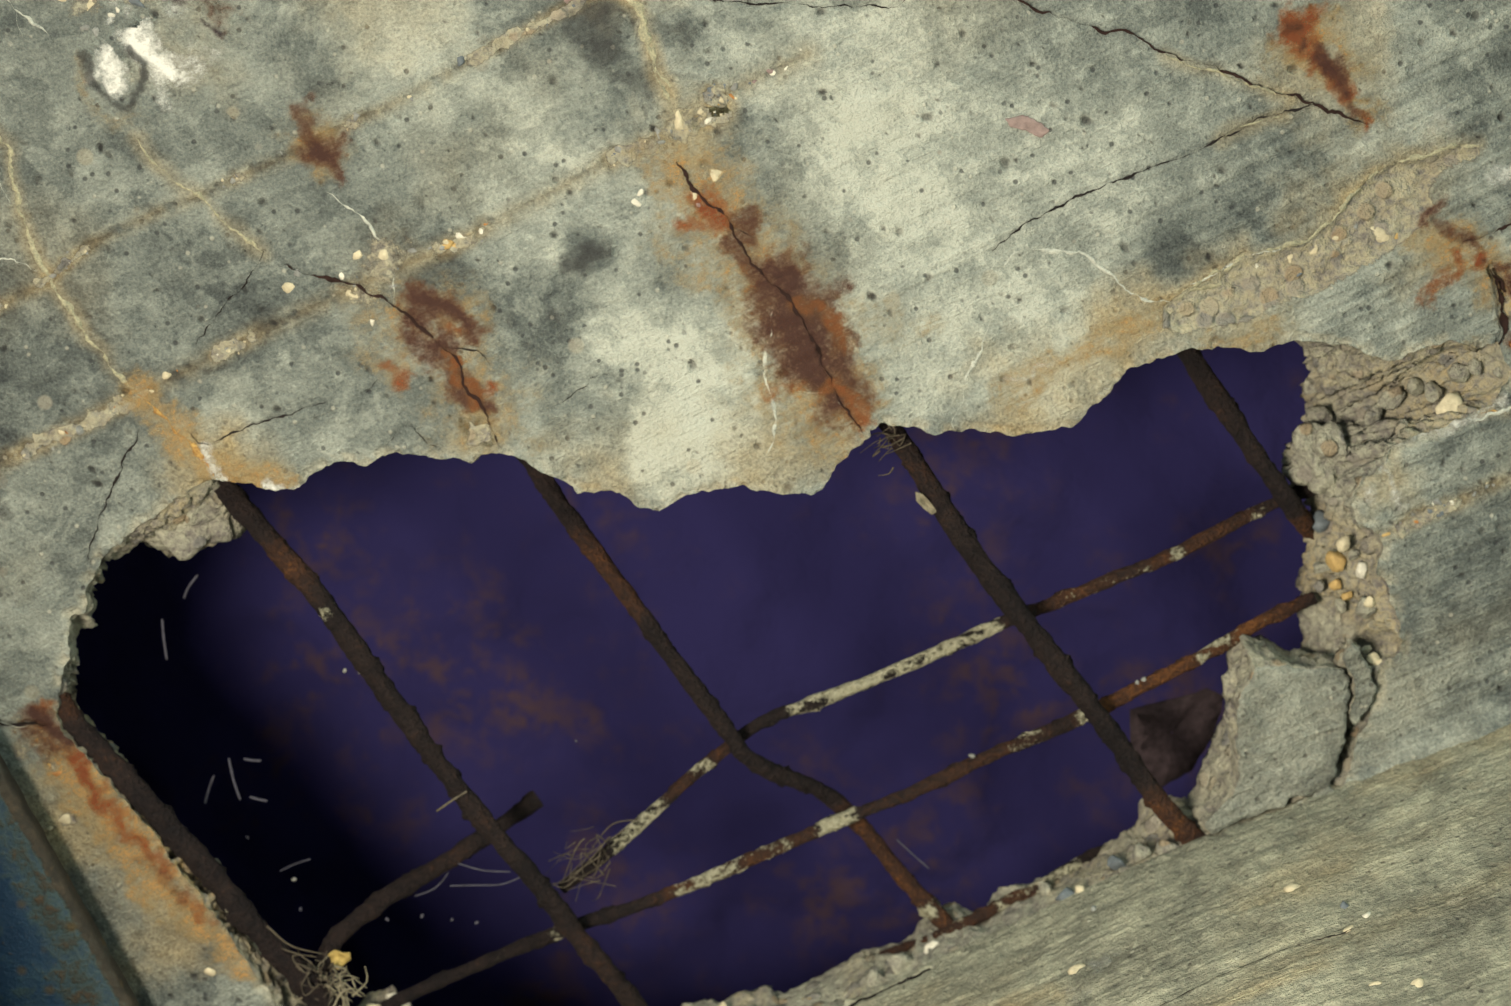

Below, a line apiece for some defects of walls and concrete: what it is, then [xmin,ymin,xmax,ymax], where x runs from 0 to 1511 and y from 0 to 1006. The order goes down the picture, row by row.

crack [0,136,323,560]
spalling [337,238,454,326]
corrosion [381,282,515,450]
spalling [690,166,723,207]
corrosion [646,146,886,459]
crack [712,0,905,9]
crack [992,0,1482,303]
spalling [1162,144,1480,334]
corrosion [1279,6,1373,130]
spalling [56,340,1511,1006]
corrosion [20,699,253,980]
crack [849,968,930,1006]